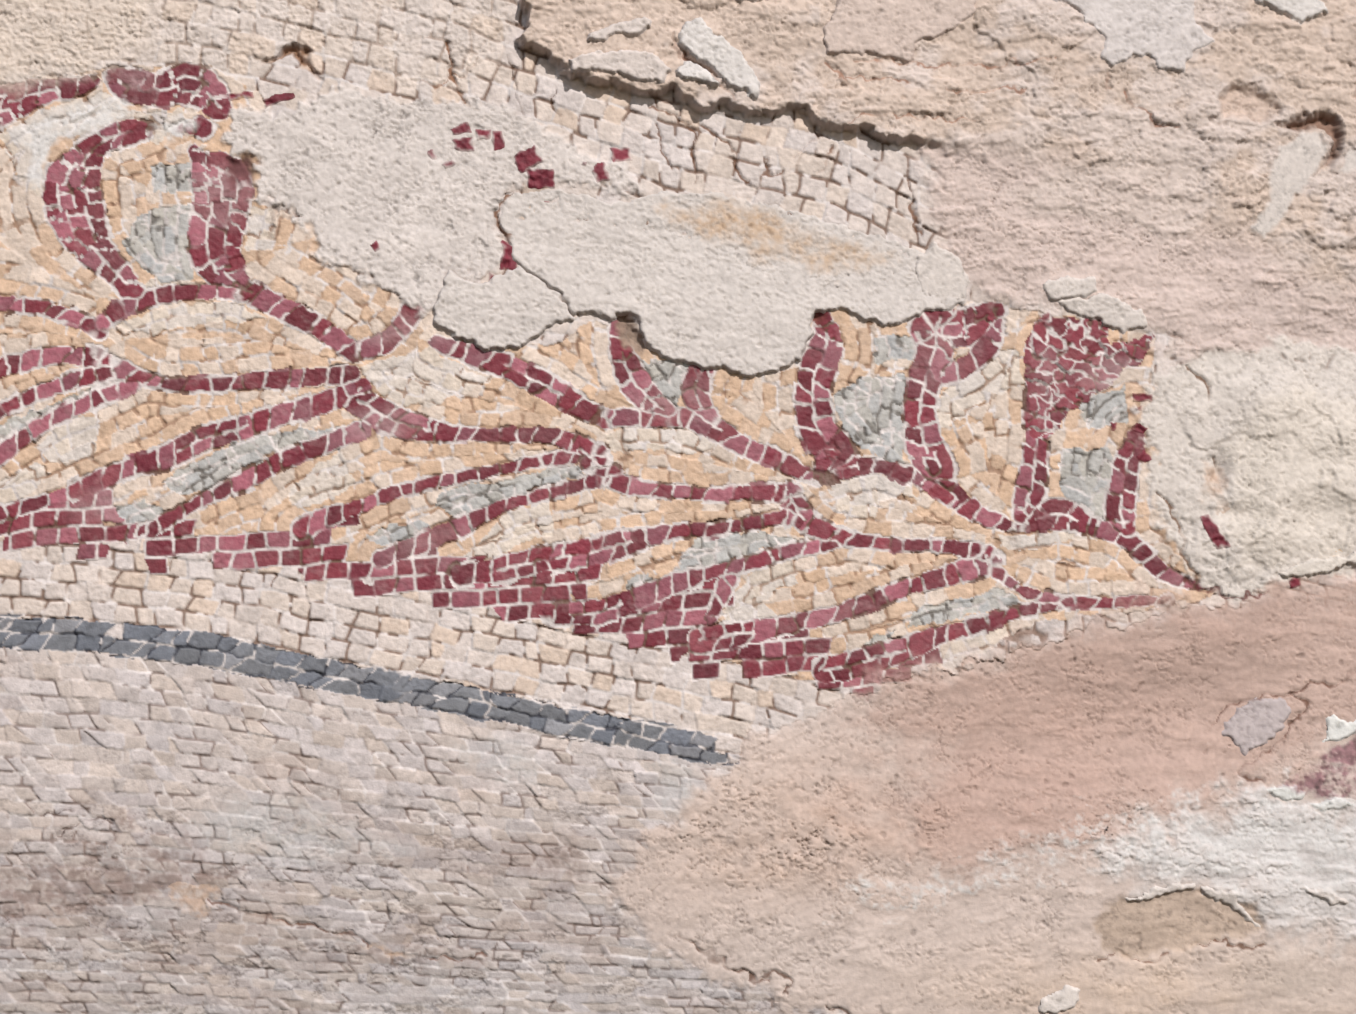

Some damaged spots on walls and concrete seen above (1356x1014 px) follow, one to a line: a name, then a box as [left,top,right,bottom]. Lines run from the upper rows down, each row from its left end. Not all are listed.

flaking render [568,16,761,100]
flaking render [823,0,977,62]
flaking render [1053,0,1215,73]
flaking render [1254,0,1329,25]
spalling [1217,81,1286,127]
spalling [612,315,655,361]
spalling [811,311,832,335]
flaking render [1042,275,1148,334]
spalling [1222,697,1291,756]
crack [1210,670,1356,784]
flaking render [1322,714,1356,742]
spalling [1091,883,1270,968]